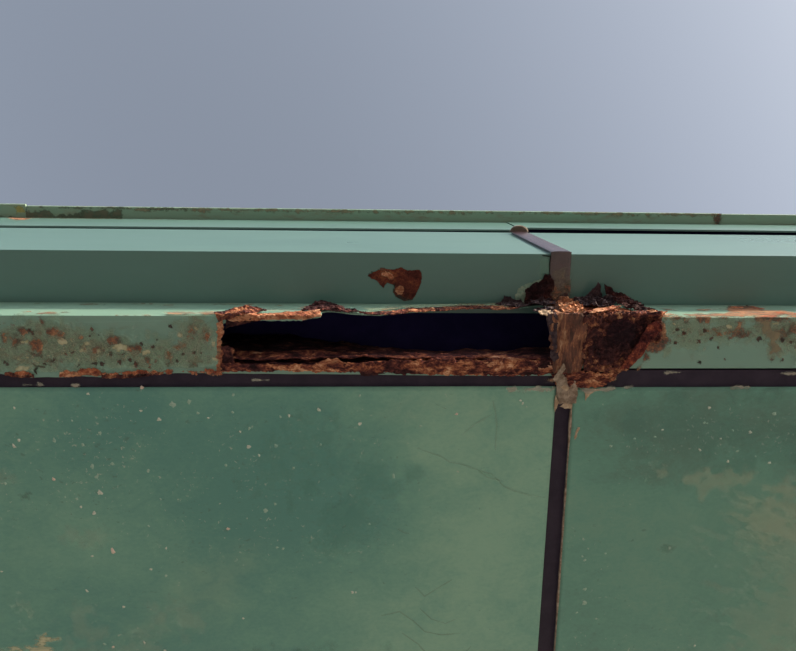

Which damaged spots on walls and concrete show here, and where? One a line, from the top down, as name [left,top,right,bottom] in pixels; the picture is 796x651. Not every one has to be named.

corrosion [59,267,615,411]
corrosion [663,305,796,361]